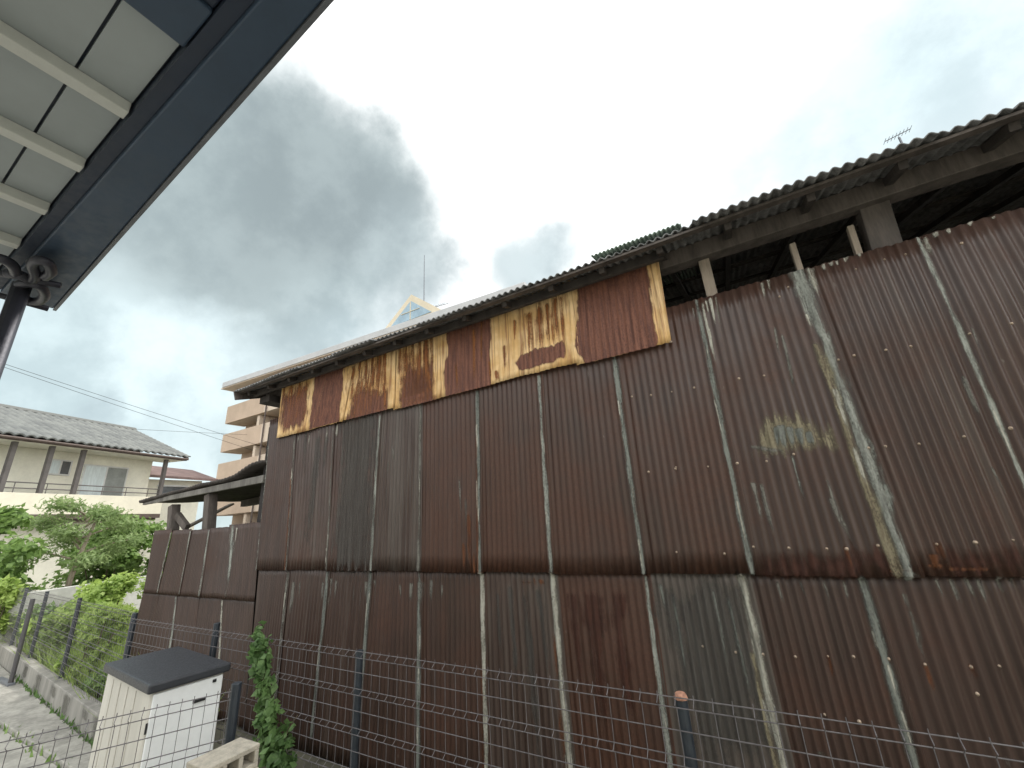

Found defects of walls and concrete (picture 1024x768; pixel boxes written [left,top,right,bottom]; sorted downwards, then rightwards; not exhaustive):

rust [279,266,658,433]
water stain [751,413,837,492]
water stain [827,481,847,531]
water stain [654,579,768,766]